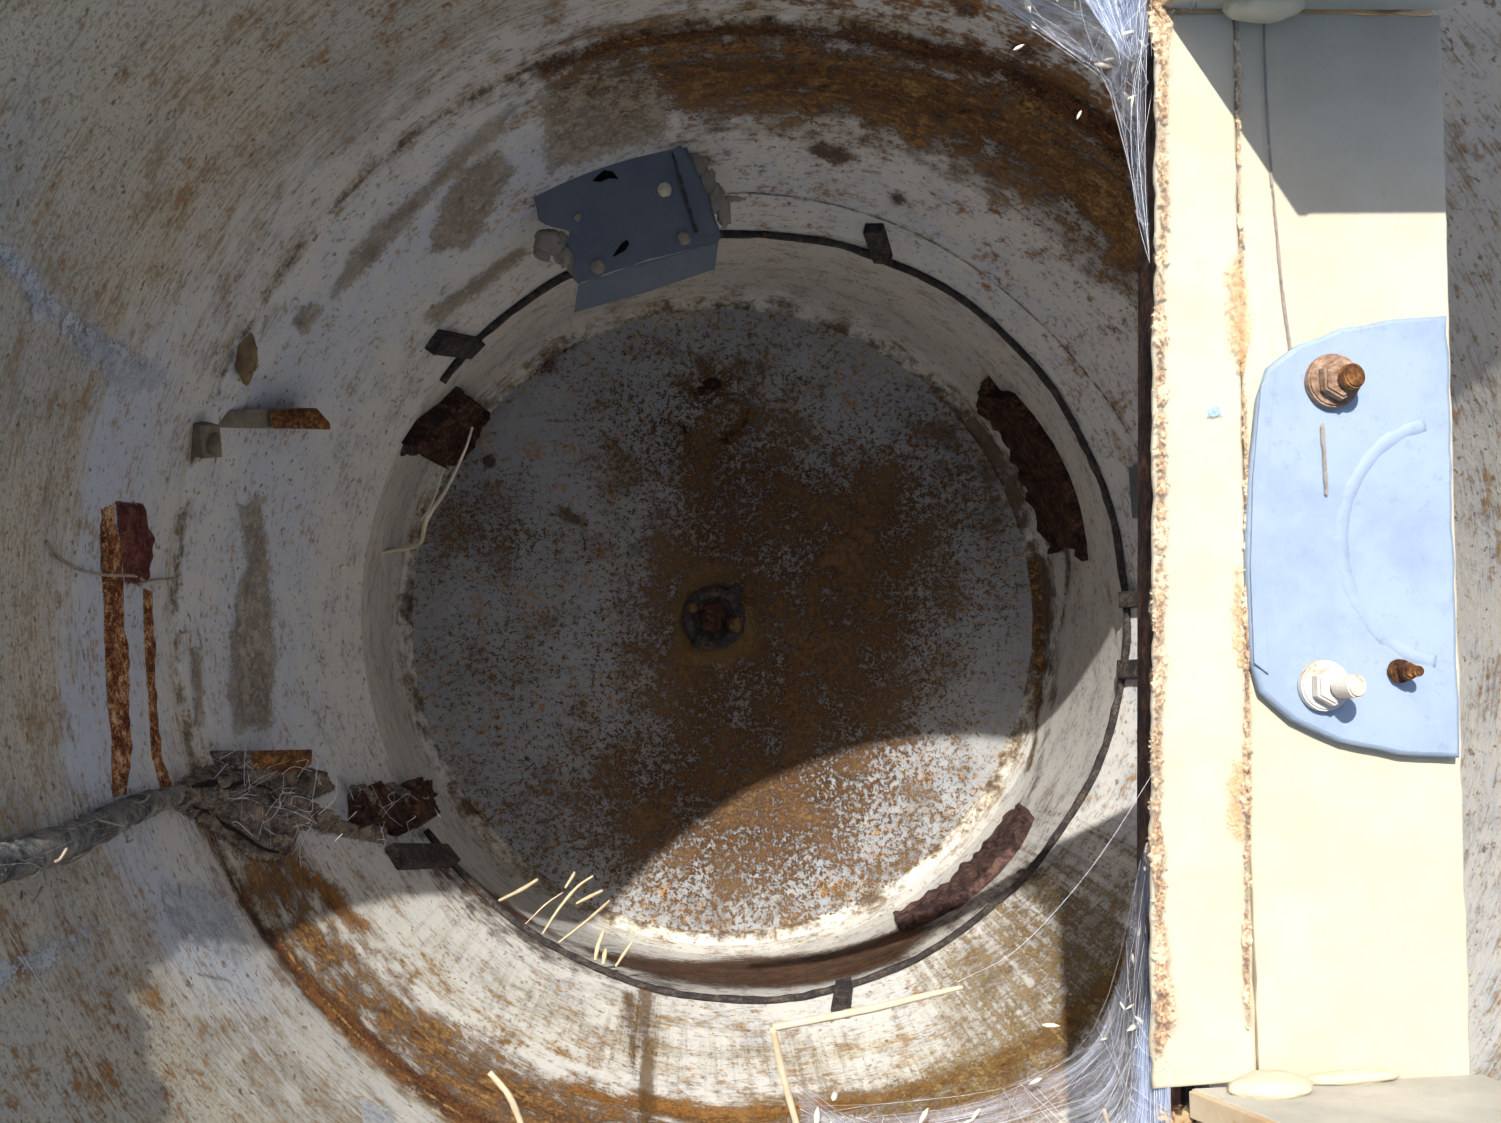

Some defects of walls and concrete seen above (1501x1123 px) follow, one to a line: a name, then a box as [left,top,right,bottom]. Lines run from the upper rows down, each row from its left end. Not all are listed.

rust [100,501,172,797]
rust [203,2,1178,1123]